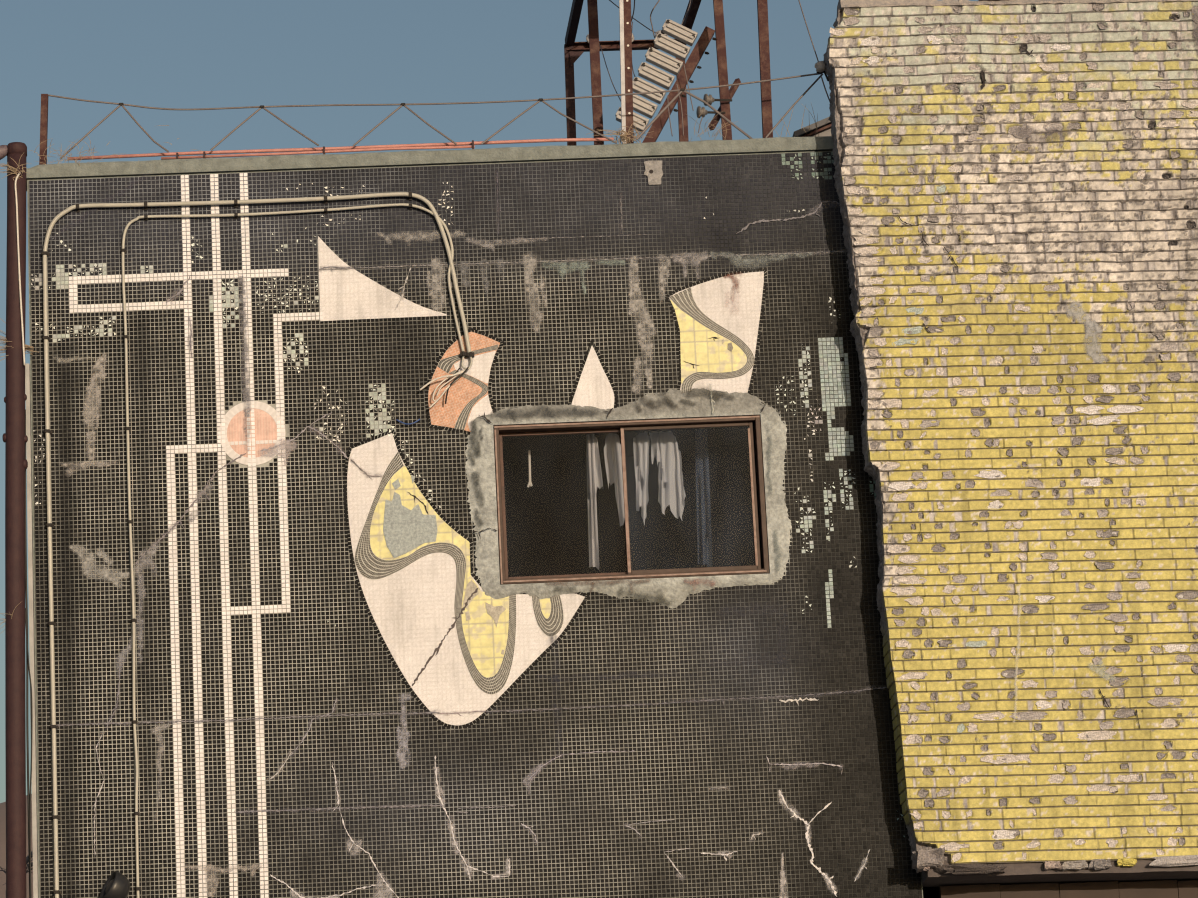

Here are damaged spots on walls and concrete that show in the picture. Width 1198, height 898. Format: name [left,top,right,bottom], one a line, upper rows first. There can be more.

spalling [1008,43,1198,149]
damp [427,259,488,310]
damp [512,238,547,331]
damp [554,257,733,412]
spalling [775,127,1198,792]
crack [58,588,887,854]
crack [238,751,632,898]
crack [664,833,762,876]
crack [767,757,870,896]
spalling [897,755,986,837]
spalling [912,820,1085,876]
spalling [1043,827,1198,871]